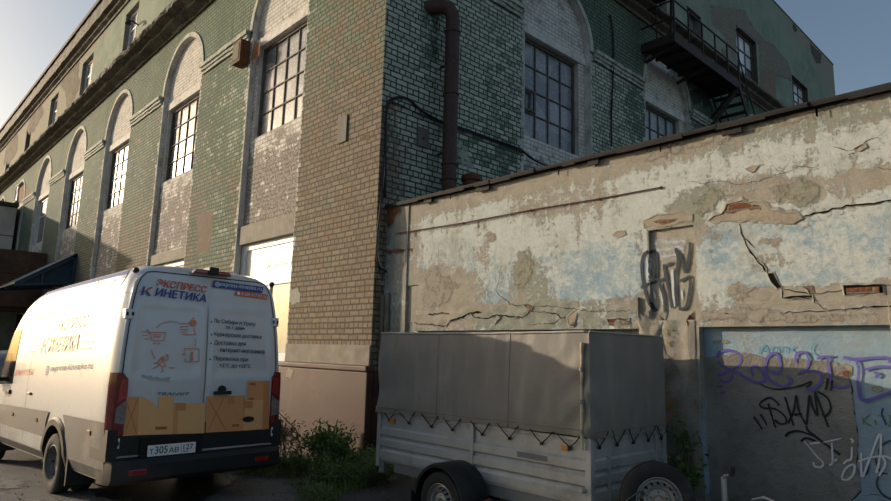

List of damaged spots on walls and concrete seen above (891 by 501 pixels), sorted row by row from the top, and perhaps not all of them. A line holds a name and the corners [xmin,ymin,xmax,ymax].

spalling [709,4,792,98]
rust [396,186,662,237]
spalling [642,177,820,229]
crack [416,266,626,327]
crack [722,223,891,314]